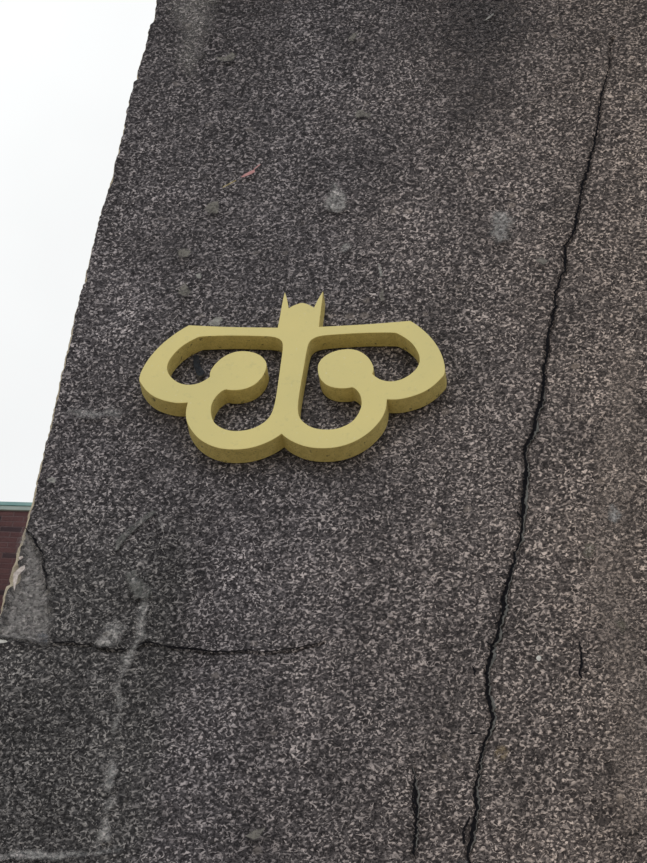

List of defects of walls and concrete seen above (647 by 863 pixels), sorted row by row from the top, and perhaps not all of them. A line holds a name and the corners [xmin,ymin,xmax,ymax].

crack [462,37,613,863]
spalling [0,527,53,643]
crack [9,640,322,653]
crack [411,768,420,857]